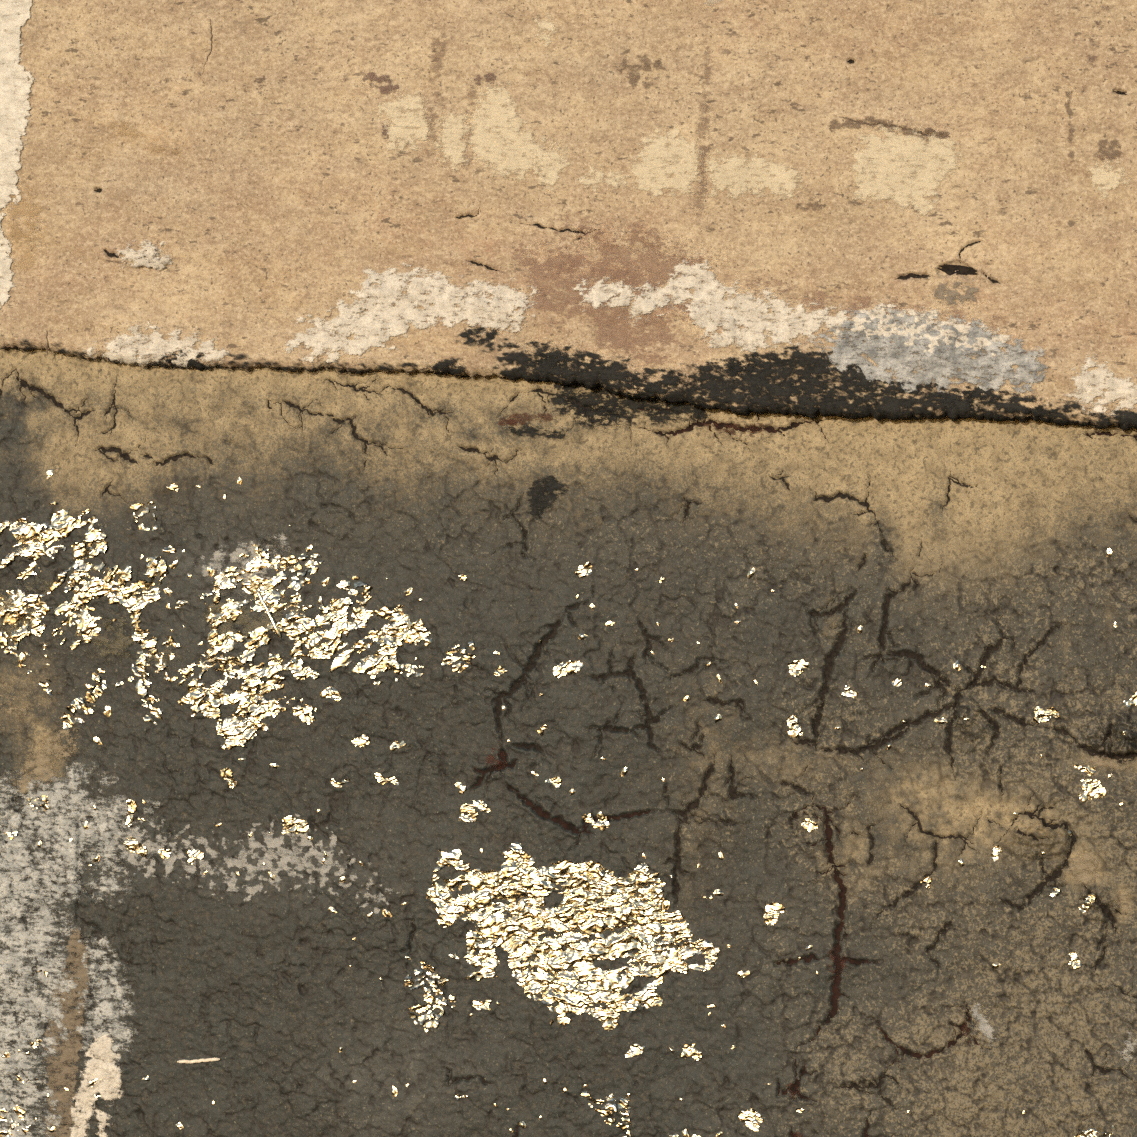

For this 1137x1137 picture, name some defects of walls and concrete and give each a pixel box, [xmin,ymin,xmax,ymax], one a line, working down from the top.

leakage [513,212,700,364]
crack [894,272,931,280]
crack [959,240,1008,284]
crack [0,368,213,504]
crack [267,377,521,476]
crack [498,386,829,452]
crack [1082,428,1137,441]
crack [469,470,1137,1137]
crack [69,810,99,930]
crack [399,919,416,969]
crack [436,1067,490,1087]